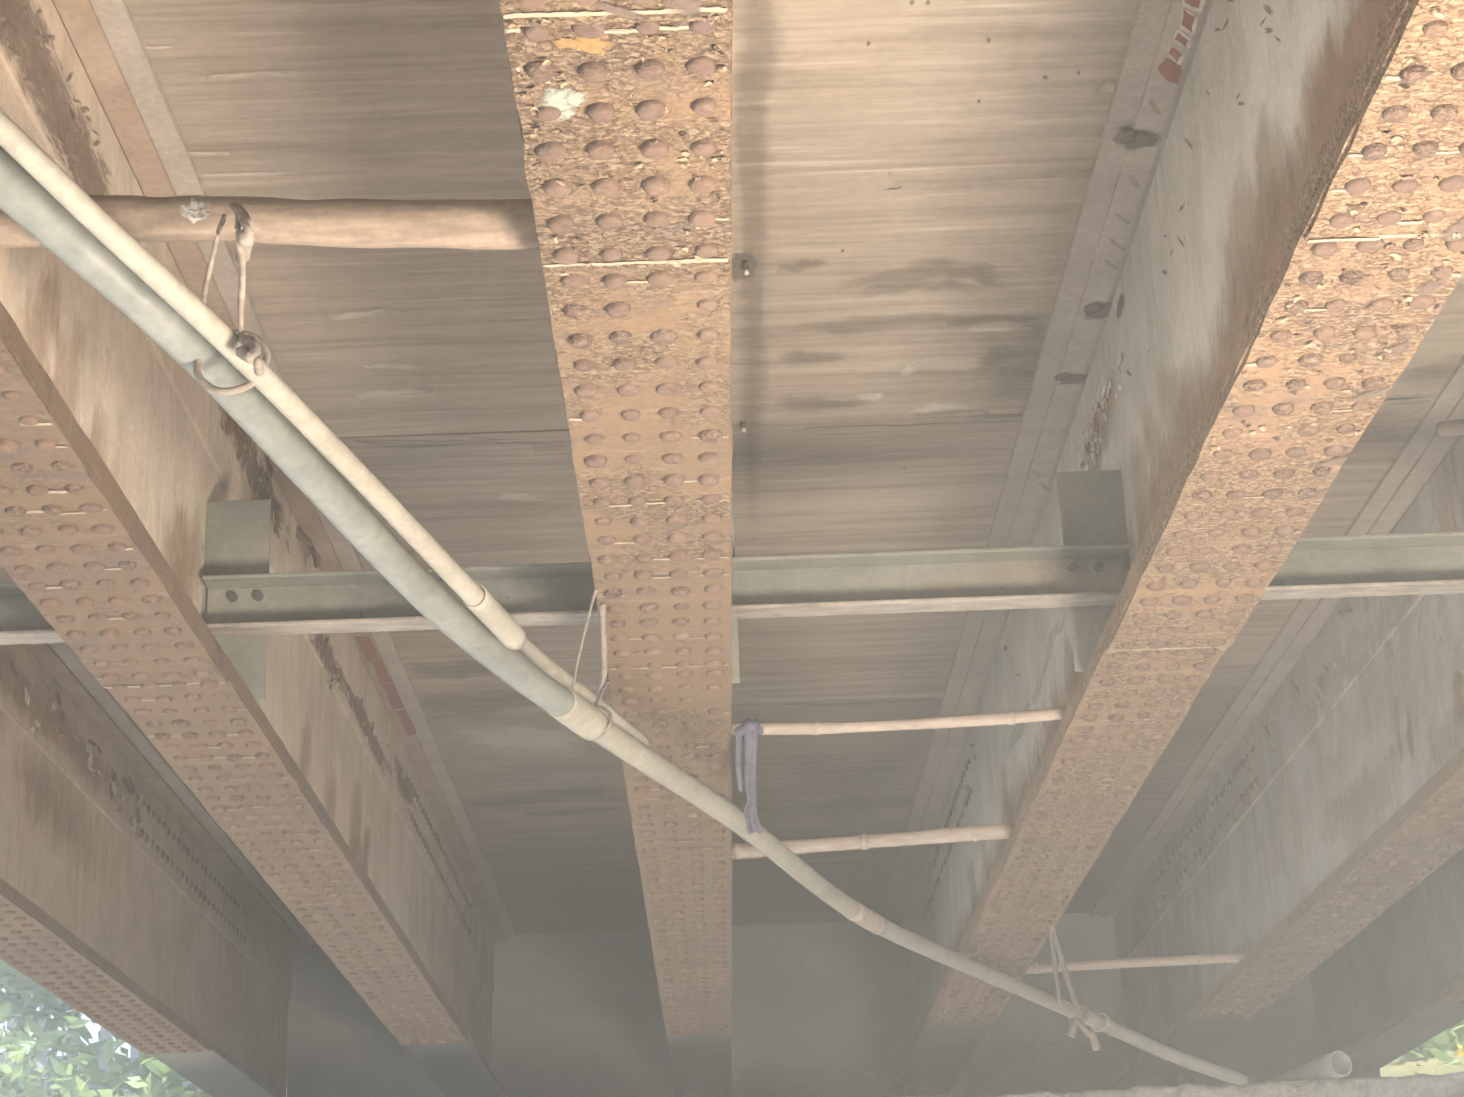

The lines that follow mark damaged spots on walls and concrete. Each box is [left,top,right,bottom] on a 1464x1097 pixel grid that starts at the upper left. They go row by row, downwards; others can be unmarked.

peeling [1158,0,1206,84]
leakage [912,403,975,414]
peeling [0,662,143,839]